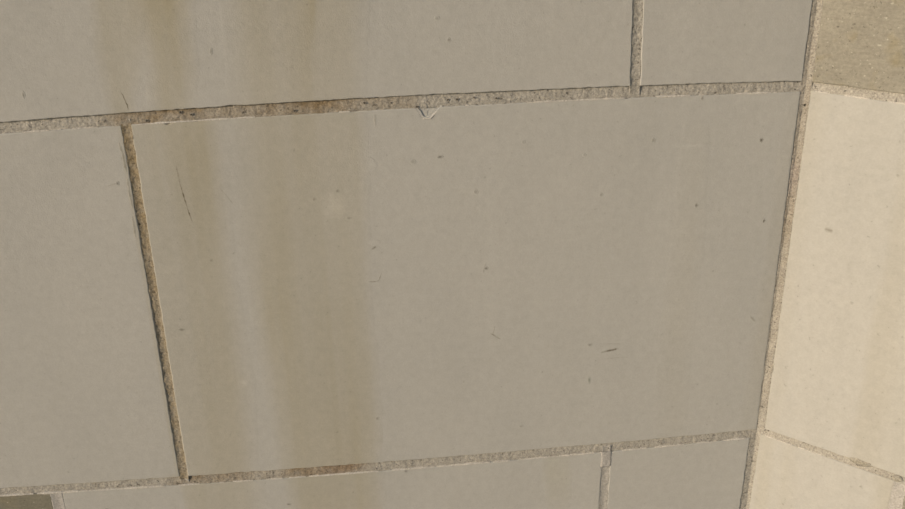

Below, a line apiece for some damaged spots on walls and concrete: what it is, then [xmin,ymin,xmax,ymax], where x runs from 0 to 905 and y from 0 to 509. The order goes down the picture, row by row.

water stain [88,0,201,112]
water stain [219,0,371,104]
water stain [134,113,384,474]
water stain [179,481,268,509]